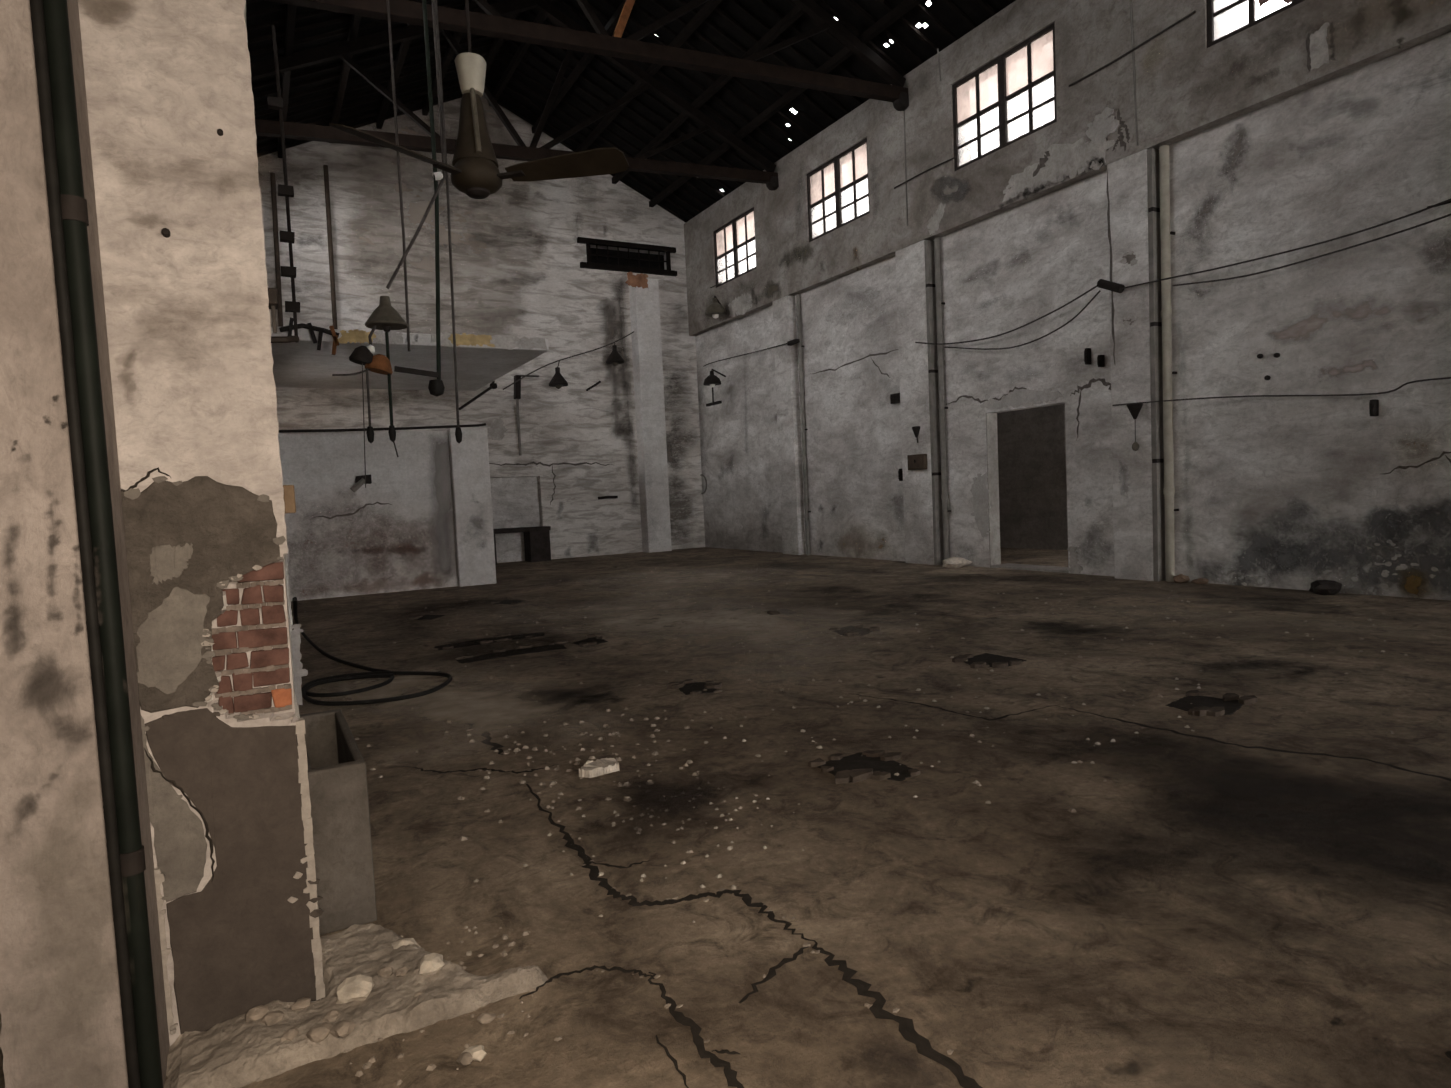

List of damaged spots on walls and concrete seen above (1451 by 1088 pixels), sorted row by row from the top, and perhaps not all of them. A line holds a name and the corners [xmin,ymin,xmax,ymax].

crack [1383,451,1451,474]
water stain [1200,500,1451,609]
flaking render [121,476,325,1000]
flaking render [154,865,178,1035]
crack [402,705,983,1088]